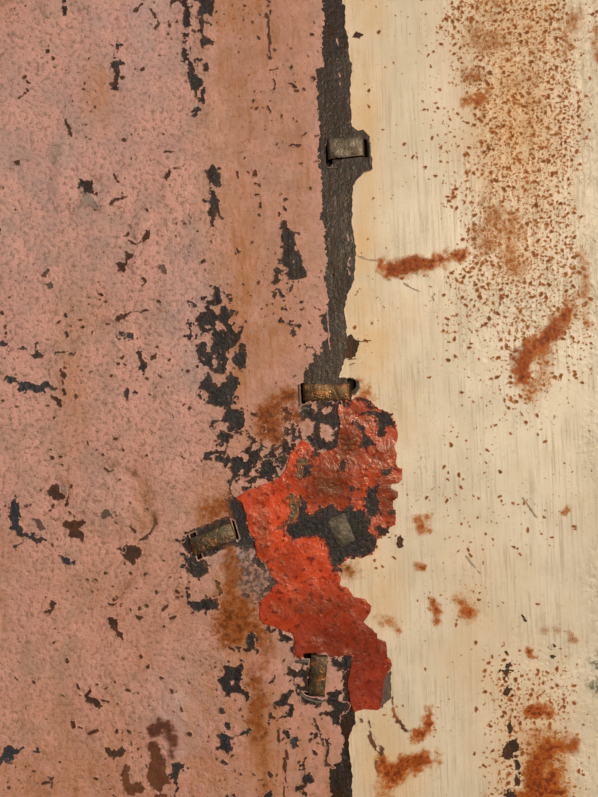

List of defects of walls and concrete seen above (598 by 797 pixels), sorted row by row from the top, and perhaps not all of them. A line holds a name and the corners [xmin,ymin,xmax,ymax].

peeling [169,0,218,118]
peeling [236,169,263,209]
peeling [271,204,308,338]
corrosion [255,388,300,445]
peeling [174,284,404,616]
corrosion [442,465,497,550]
peeling [160,603,179,629]
corrosion [213,546,272,655]
peeling [0,739,42,768]
corrosion [247,669,268,751]
corrosion [377,707,441,796]
corrosion [473,642,590,797]